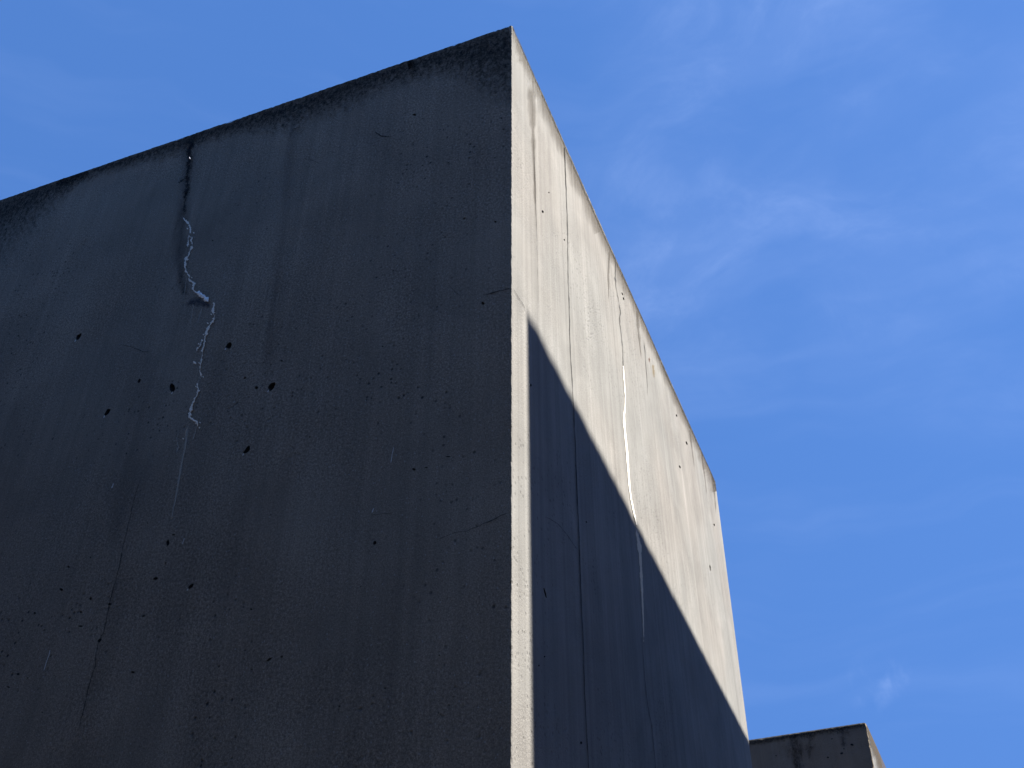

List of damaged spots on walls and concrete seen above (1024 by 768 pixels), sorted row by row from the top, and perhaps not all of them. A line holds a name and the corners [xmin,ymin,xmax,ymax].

crack [183,218,215,439]
crack [615,266,656,768]